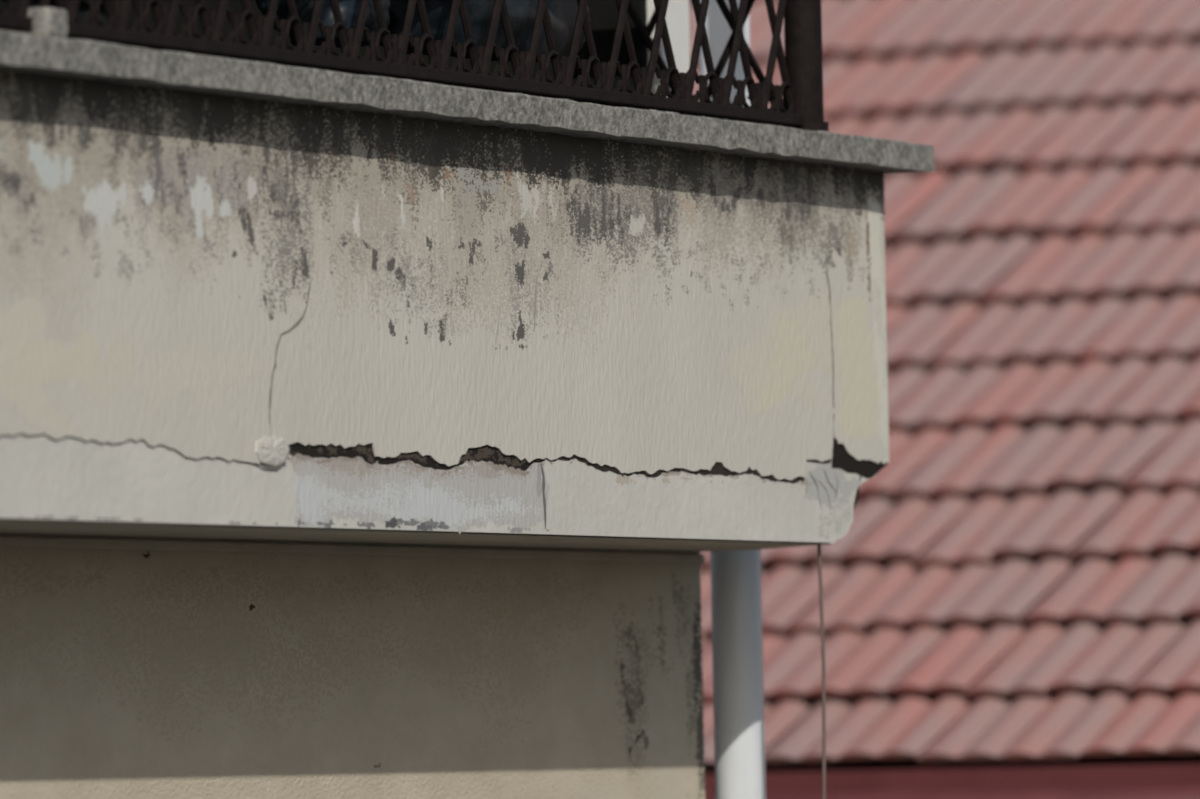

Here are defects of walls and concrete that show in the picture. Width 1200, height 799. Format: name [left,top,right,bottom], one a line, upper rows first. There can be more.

water stain [0,70,885,438]
spalling [287,444,588,534]
crack [0,249,888,529]
spalling [798,463,861,511]
water stain [0,542,602,748]
water stain [613,573,705,799]